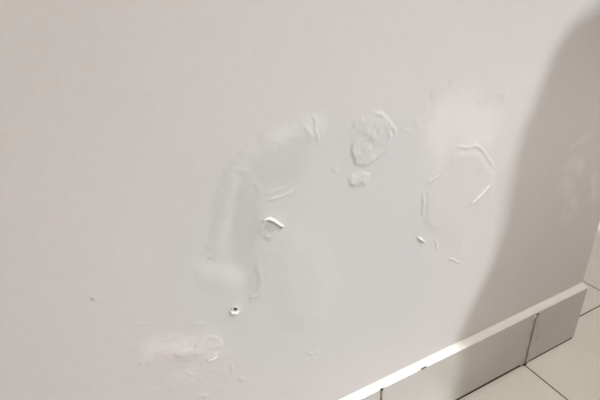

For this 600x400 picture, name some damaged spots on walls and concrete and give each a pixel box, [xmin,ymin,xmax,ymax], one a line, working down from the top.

peeling [262,217,285,237]